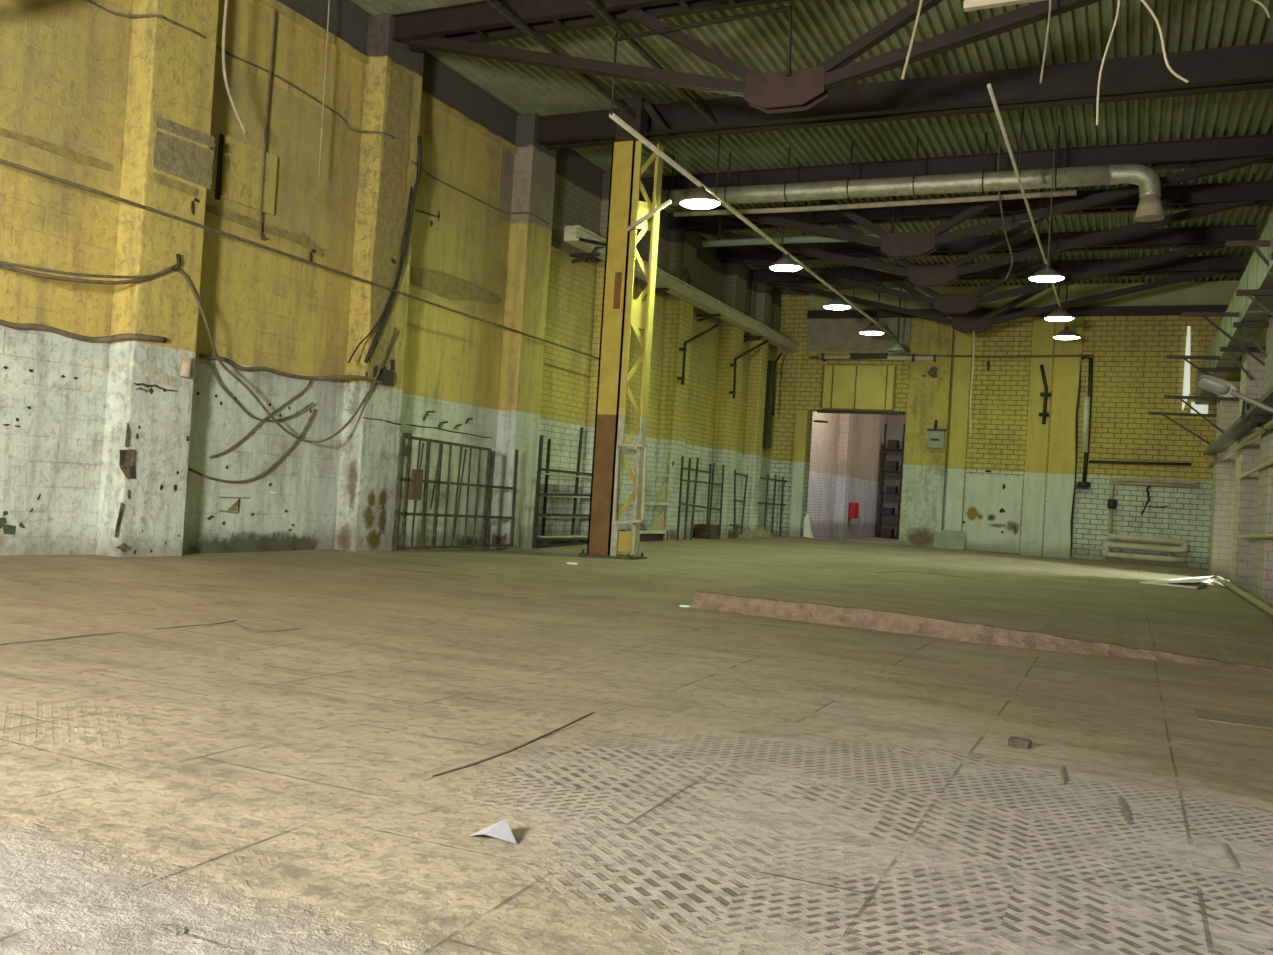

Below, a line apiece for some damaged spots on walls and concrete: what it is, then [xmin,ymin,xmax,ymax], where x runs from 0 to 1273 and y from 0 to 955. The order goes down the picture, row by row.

peeling [0,494,41,535]
corrosion [967,507,1018,534]
water stain [188,533,315,553]
crack [0,620,301,650]